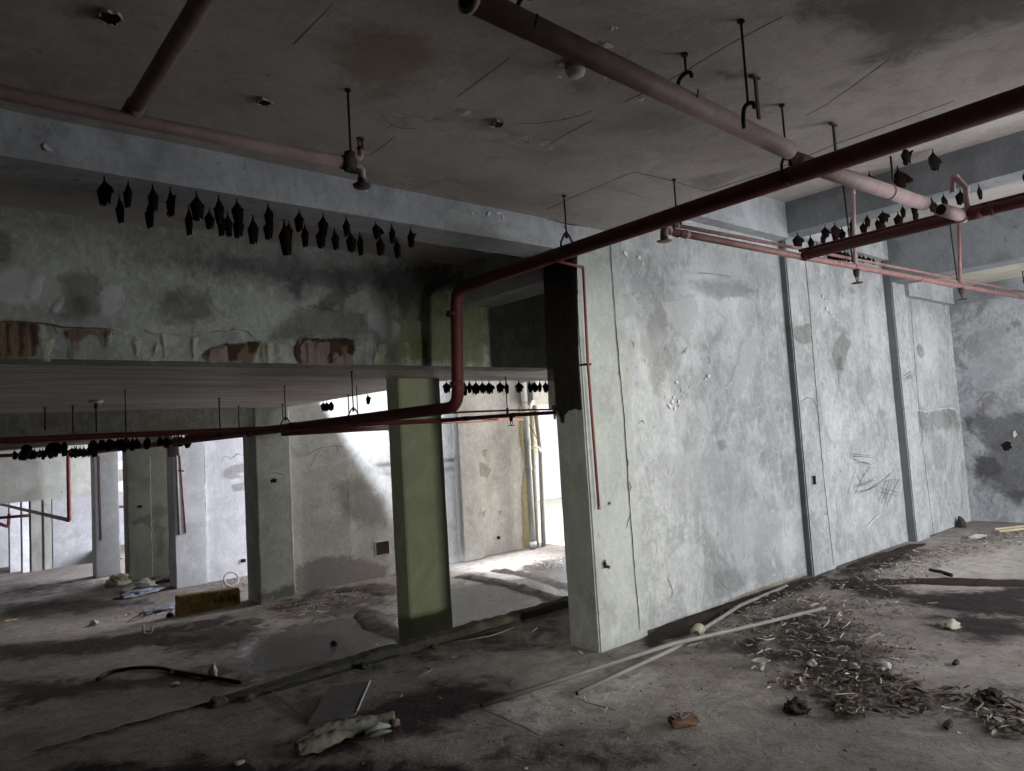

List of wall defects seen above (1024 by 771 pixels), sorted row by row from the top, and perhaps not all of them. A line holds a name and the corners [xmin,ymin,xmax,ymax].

spalling [295,338,356,366]